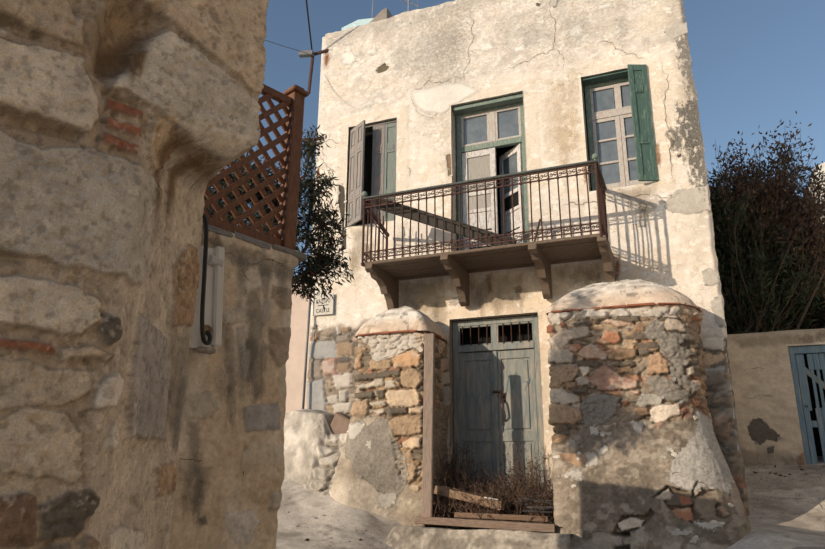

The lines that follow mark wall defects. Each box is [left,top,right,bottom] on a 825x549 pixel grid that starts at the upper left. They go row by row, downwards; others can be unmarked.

crack [503,0,565,70]
crack [411,18,476,118]
spalling [664,185,711,214]
peeling [548,307,679,325]
peeling [358,332,424,362]
peeling [629,420,647,434]
peeling [747,418,781,454]
spalling [552,425,611,488]